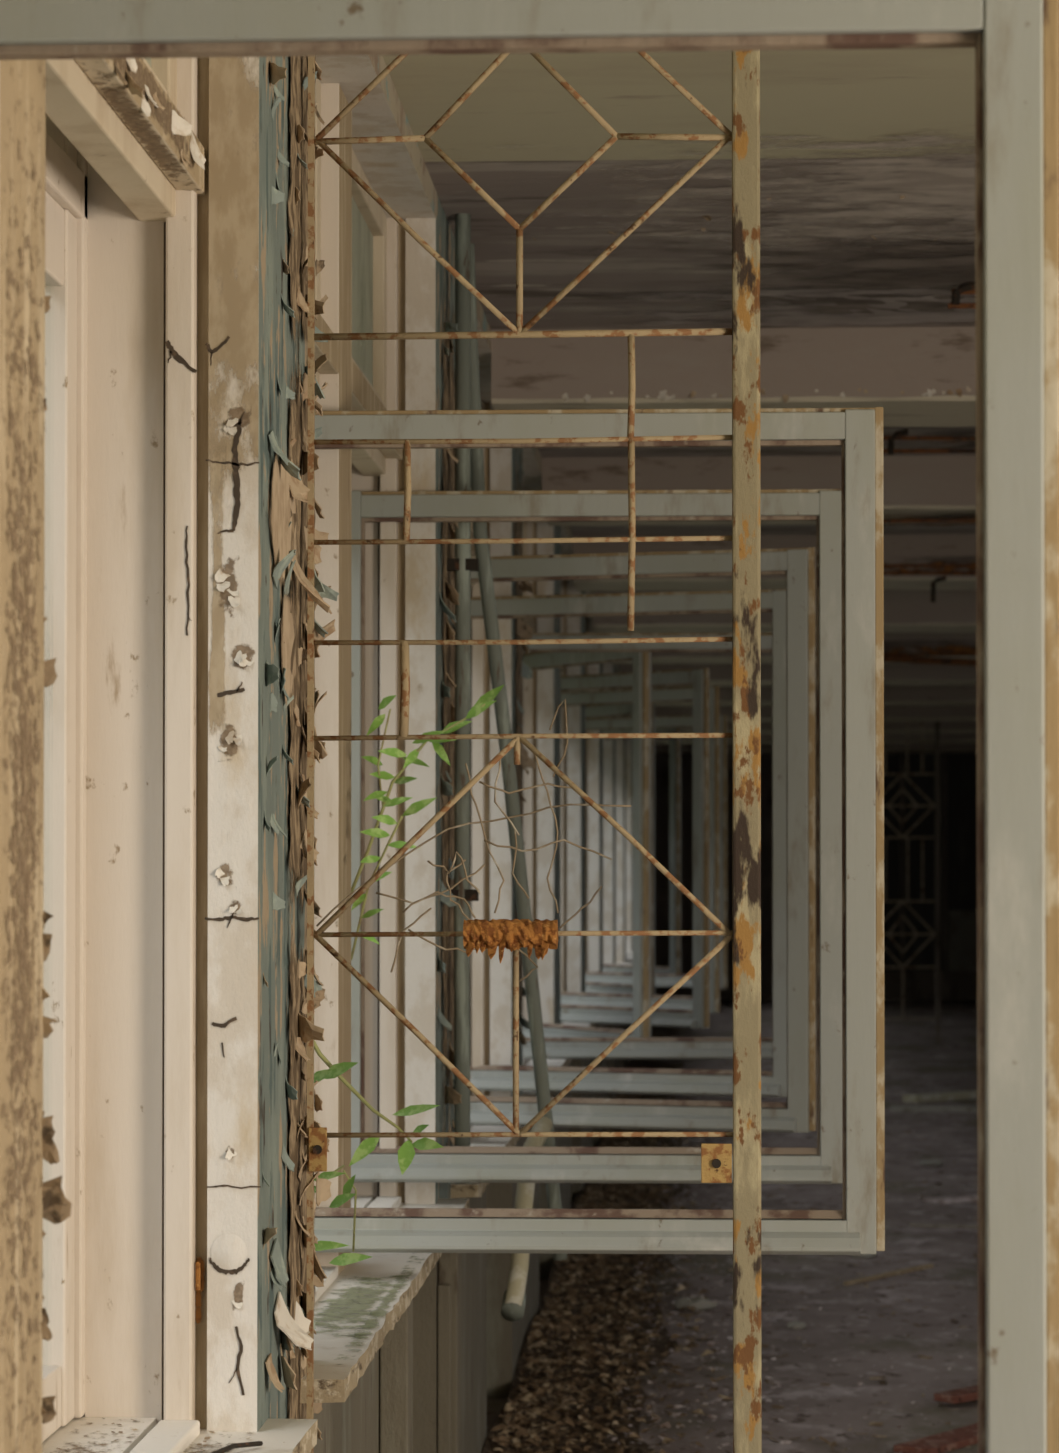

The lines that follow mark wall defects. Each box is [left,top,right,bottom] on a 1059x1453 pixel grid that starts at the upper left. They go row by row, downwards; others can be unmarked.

peeling [81,58,206,191]
leakage [760,238,976,314]
spalling [224,407,252,435]
spalling [215,557,240,616]
peeling [0,128,72,1453]
peeling [231,56,339,1440]